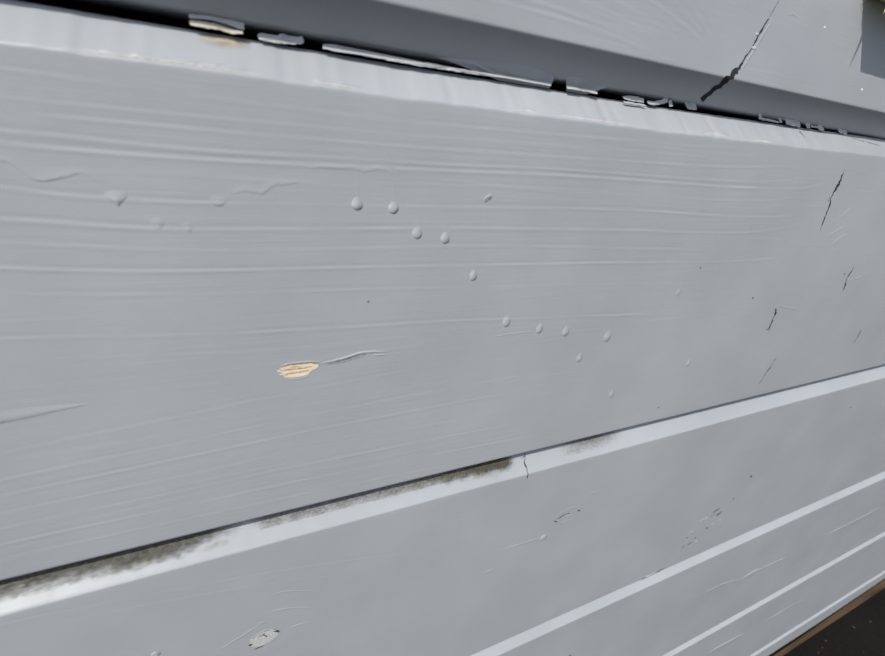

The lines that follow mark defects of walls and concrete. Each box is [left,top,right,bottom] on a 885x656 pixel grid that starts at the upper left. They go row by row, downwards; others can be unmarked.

peeling [188,14,245,34]
peeling [257,33,304,45]
peeling [323,44,554,89]
peeling [565,77,607,95]
peeling [622,96,673,107]
crack [700,1,779,102]
crack [821,170,846,231]
peeling [277,361,323,380]
damp [269,457,510,519]
damp [0,527,220,595]